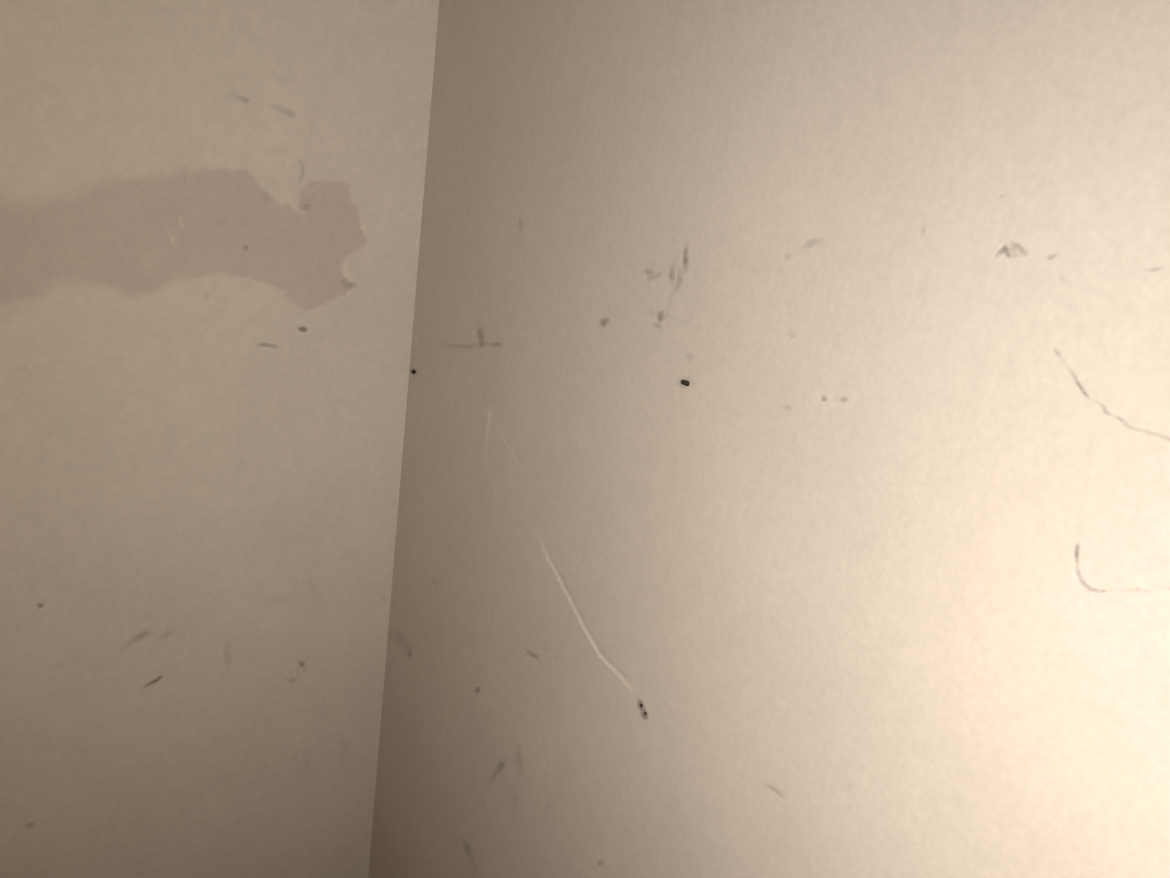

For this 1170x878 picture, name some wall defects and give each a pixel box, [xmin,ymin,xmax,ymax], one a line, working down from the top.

peeling [0,161,369,322]